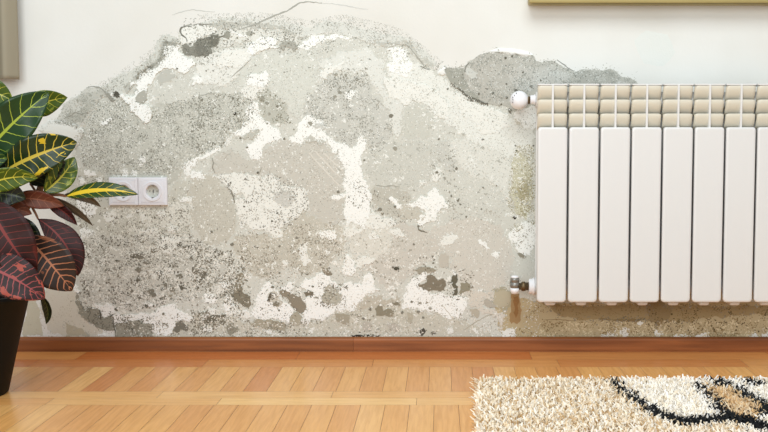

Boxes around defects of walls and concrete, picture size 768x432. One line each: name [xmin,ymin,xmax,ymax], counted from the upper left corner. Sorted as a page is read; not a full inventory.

crack [173,1,368,41]
peeling [64,24,638,337]
damp [22,12,768,337]
corrosion [509,294,522,324]